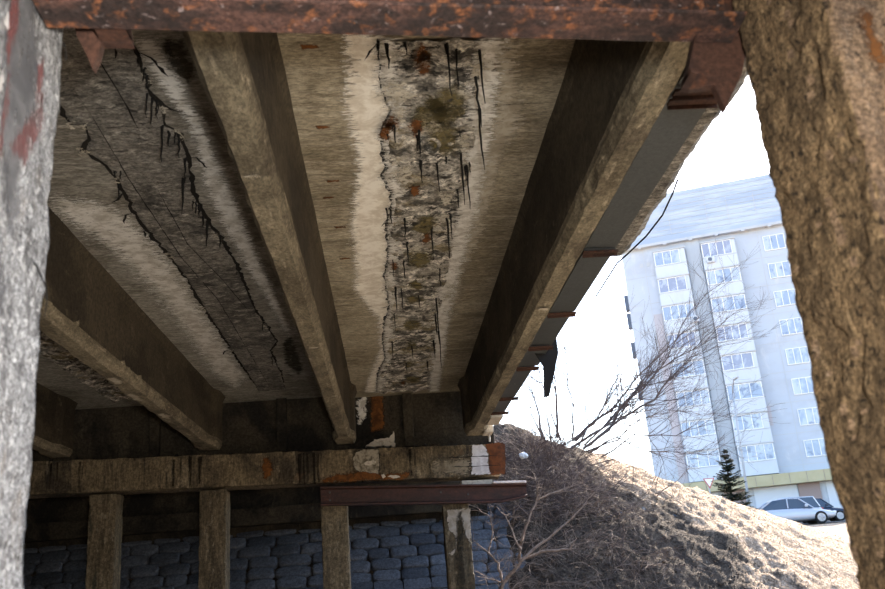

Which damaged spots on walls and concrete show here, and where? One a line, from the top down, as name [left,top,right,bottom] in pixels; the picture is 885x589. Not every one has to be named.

crack [59,44,292,391]
spalling [365,36,512,394]
damp [443,38,528,331]
rust [321,471,410,483]
rust [486,442,506,475]